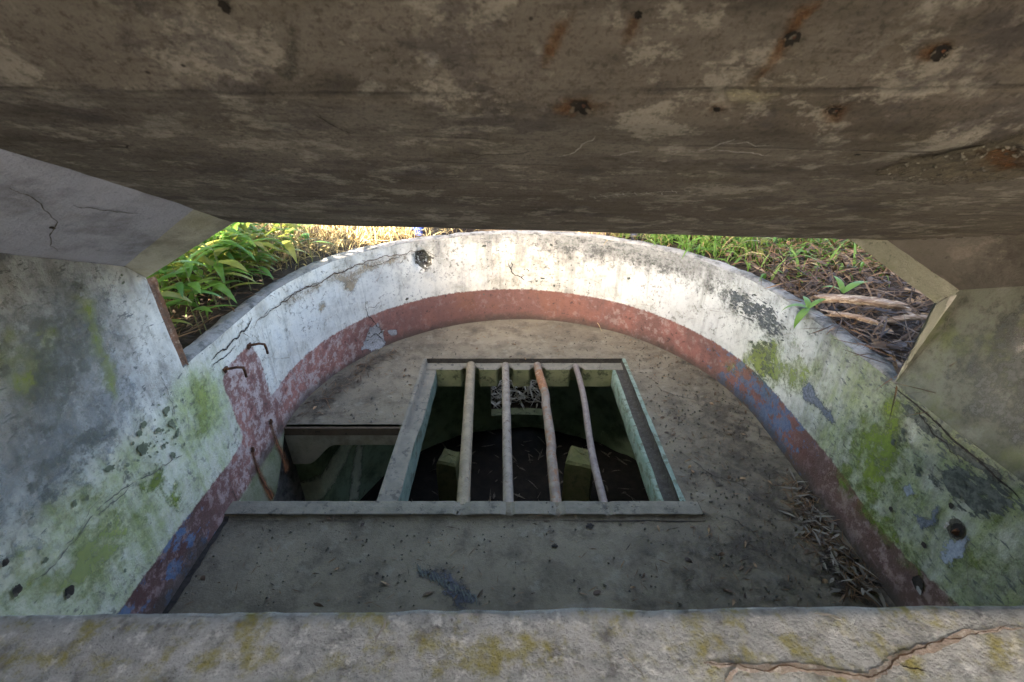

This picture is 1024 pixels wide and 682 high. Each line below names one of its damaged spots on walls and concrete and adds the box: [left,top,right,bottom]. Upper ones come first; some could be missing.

crack [10,188,138,251]
crack [212,251,435,382]
spalling [361,323,397,352]
leakage [0,272,146,524]
peeling [802,383,836,424]
leakage [946,297,1024,445]
leakage [140,469,181,511]
corrosion [251,447,275,501]
peeling [891,403,1015,567]
crack [704,625,1024,682]